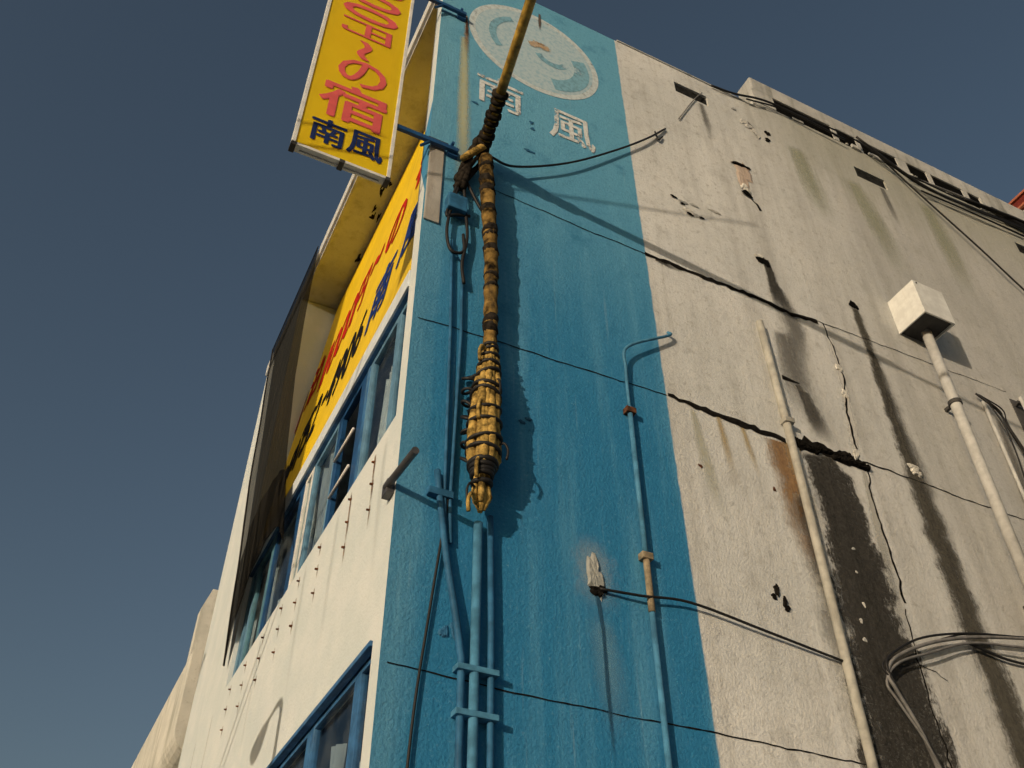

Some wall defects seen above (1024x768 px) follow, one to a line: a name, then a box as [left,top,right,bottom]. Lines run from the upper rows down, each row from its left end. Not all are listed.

peeling [670,194,721,219]
spalling [731,161,762,211]
damp [754,254,823,425]
crack [387,190,1024,768]
spalling [771,584,791,612]
rust [768,439,810,547]
damp [800,454,959,768]
damp [849,300,1024,768]